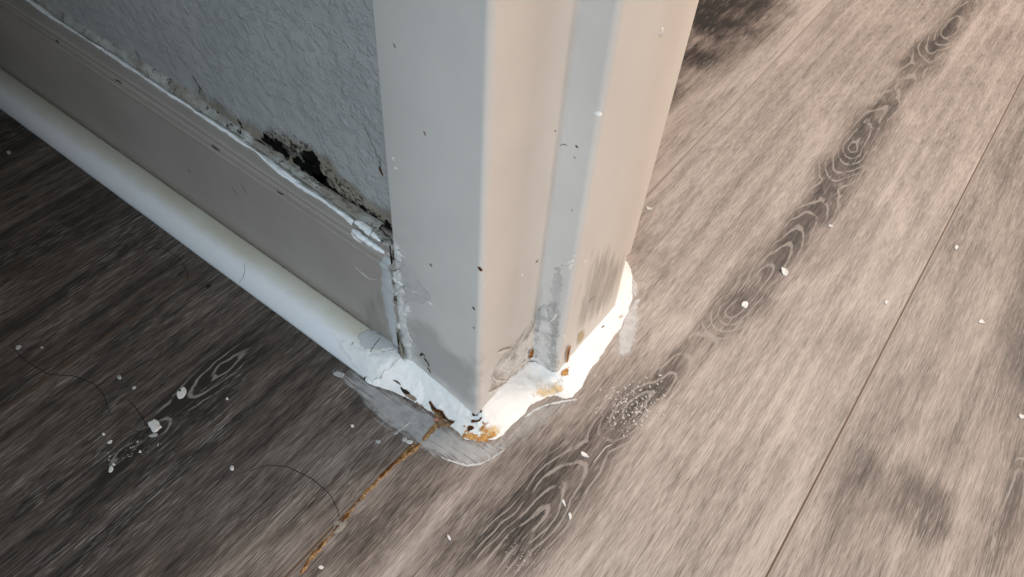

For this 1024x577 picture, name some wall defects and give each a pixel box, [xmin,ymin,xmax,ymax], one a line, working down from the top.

leakage [202,95,392,230]
rust [537,346,571,396]
spalling [400,387,454,429]
rust [462,409,499,442]